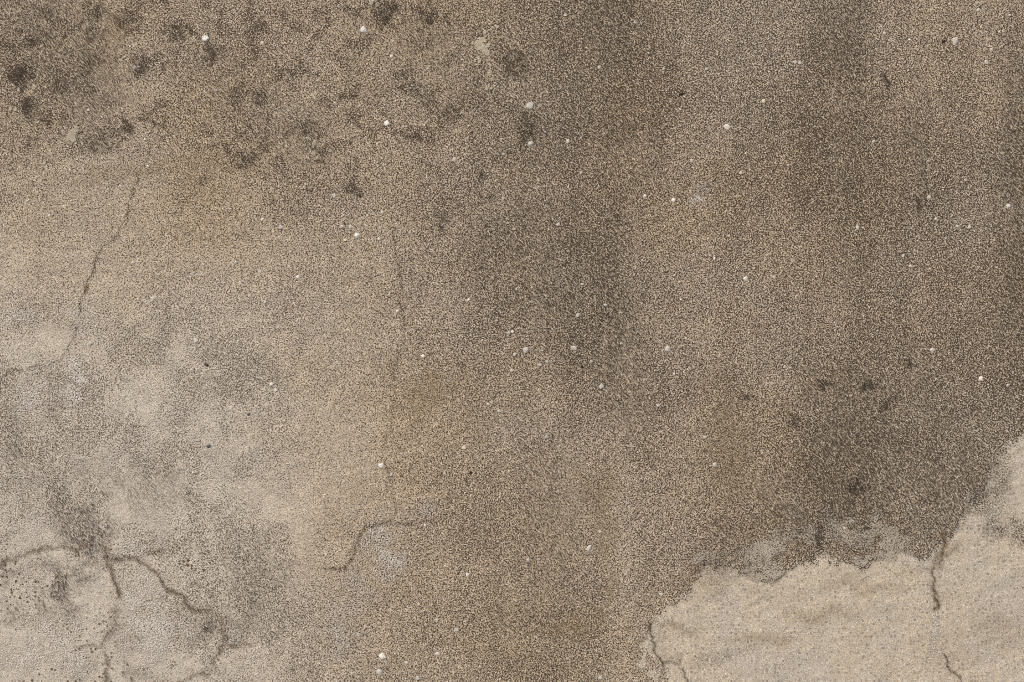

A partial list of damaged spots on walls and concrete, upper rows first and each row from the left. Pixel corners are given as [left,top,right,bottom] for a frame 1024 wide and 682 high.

damp [1,0,148,153]
damp [191,43,333,169]
damp [371,0,465,116]
damp [815,0,862,194]
damp [497,0,655,434]
damp [988,56,1024,365]
crack [1,544,250,682]
damp [327,510,405,653]
damp [524,437,577,603]
spalling [636,423,1024,682]
damp [738,346,1024,554]
crack [931,532,947,610]